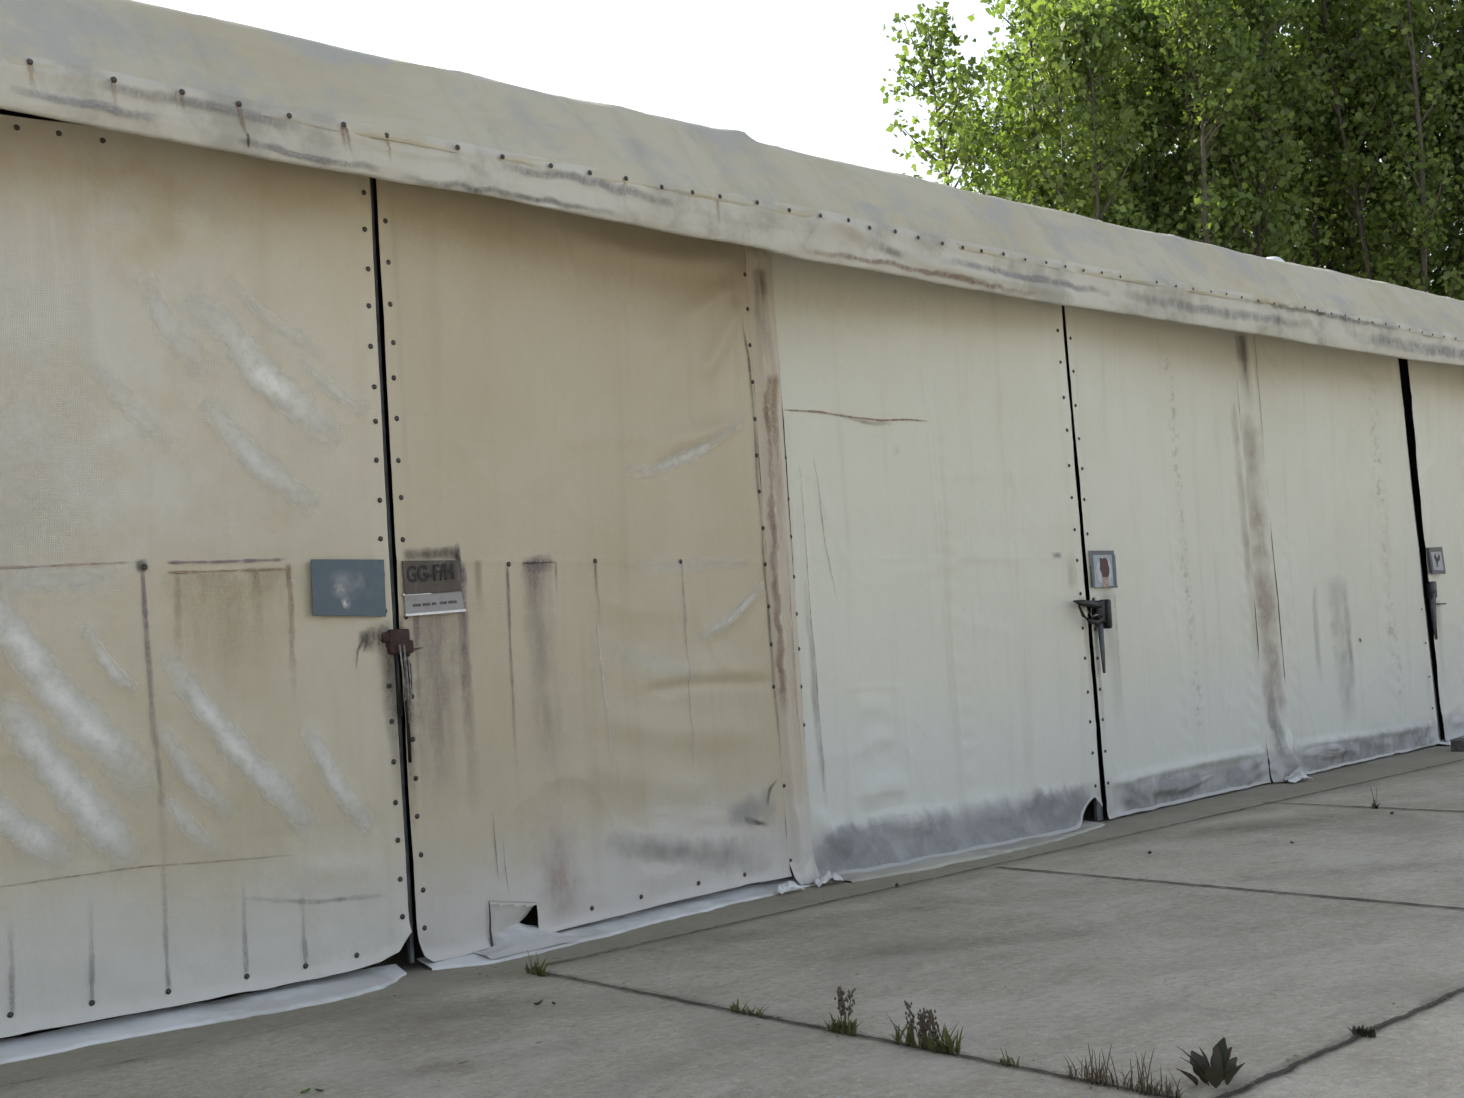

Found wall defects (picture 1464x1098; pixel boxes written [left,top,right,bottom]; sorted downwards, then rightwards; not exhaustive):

water stain [170,558,292,598]
water stain [456,550,467,654]
water stain [507,558,546,647]